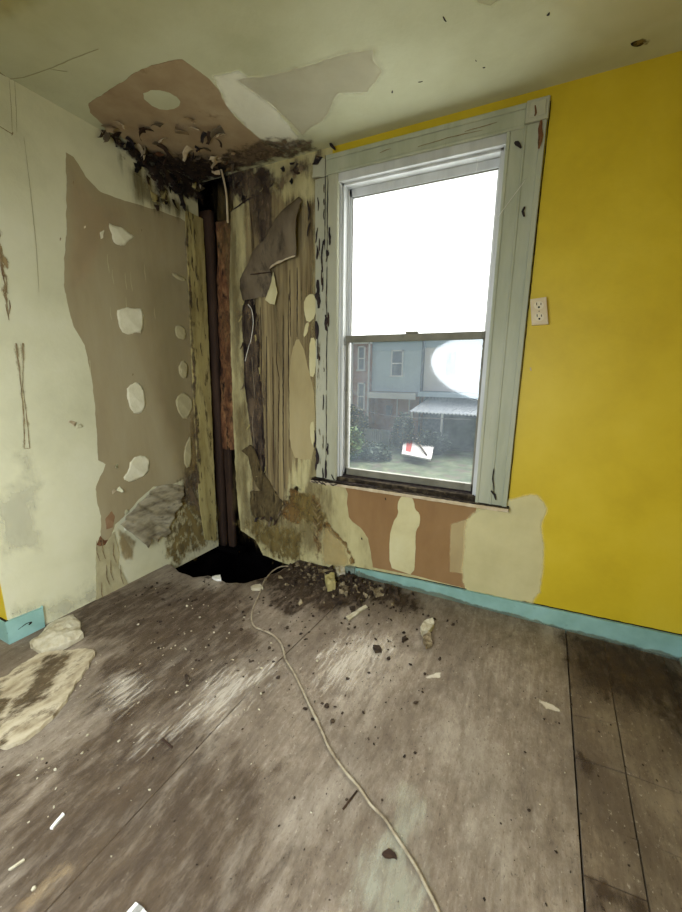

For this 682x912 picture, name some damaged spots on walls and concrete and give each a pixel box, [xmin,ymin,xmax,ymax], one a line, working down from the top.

peeling [534,105,543,149]
peeling [64,59,285,546]
leakage [99,51,423,615]
peeling [307,143,381,487]
spalling [175,450,289,583]